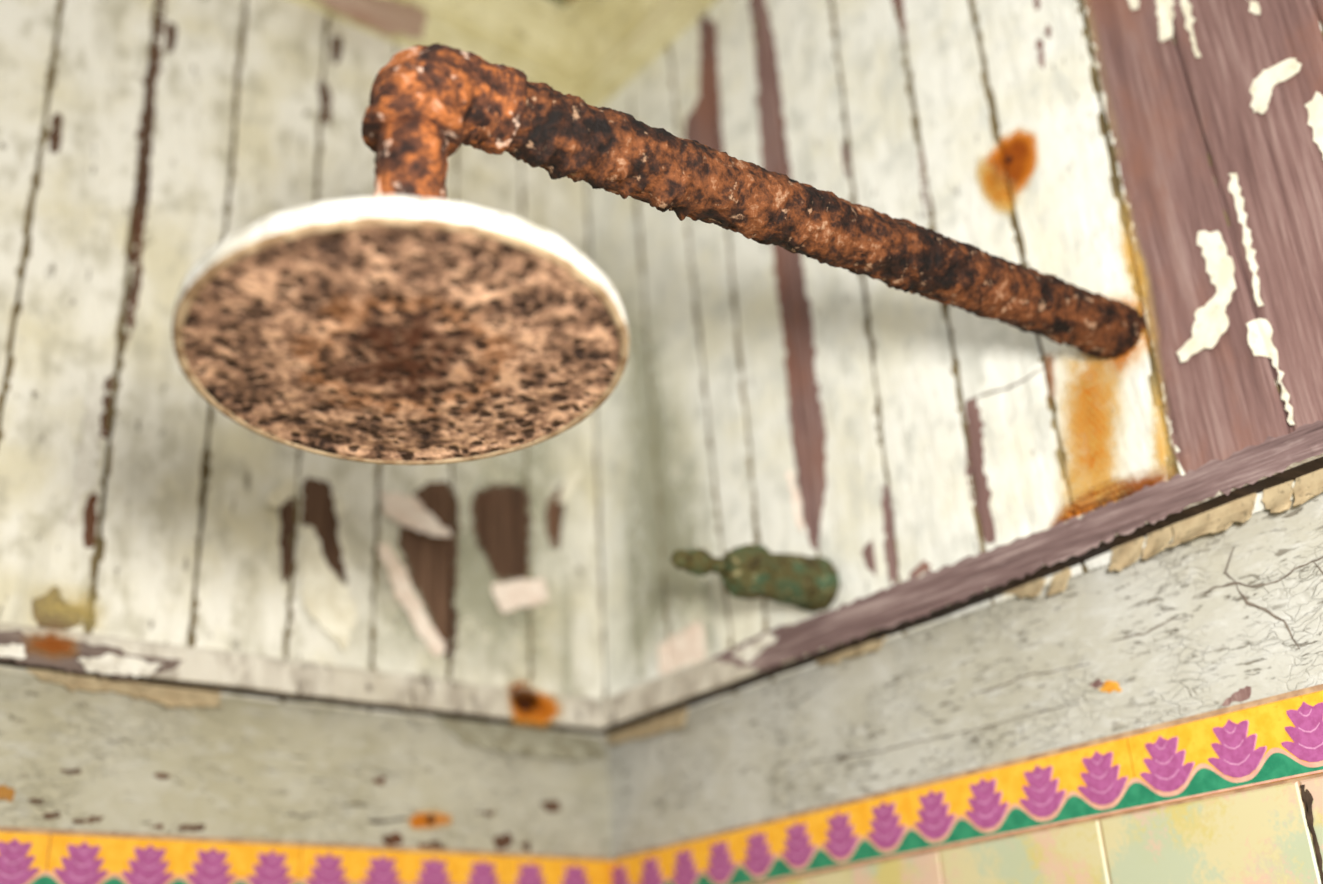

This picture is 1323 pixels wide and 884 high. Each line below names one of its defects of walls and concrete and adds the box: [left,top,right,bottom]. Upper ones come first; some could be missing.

corrosion [977,130,1036,212]
peeling [657,0,1323,675]
corrosion [1046,203,1170,526]
peeling [65,377,113,549]
peeling [0,586,222,708]
peeling [265,476,358,650]
peeling [377,470,583,661]
corrosion [508,681,560,724]
crack [798,705,1070,766]
crack [970,663,1091,694]
crack [1113,546,1323,650]
crack [1300,785,1323,884]